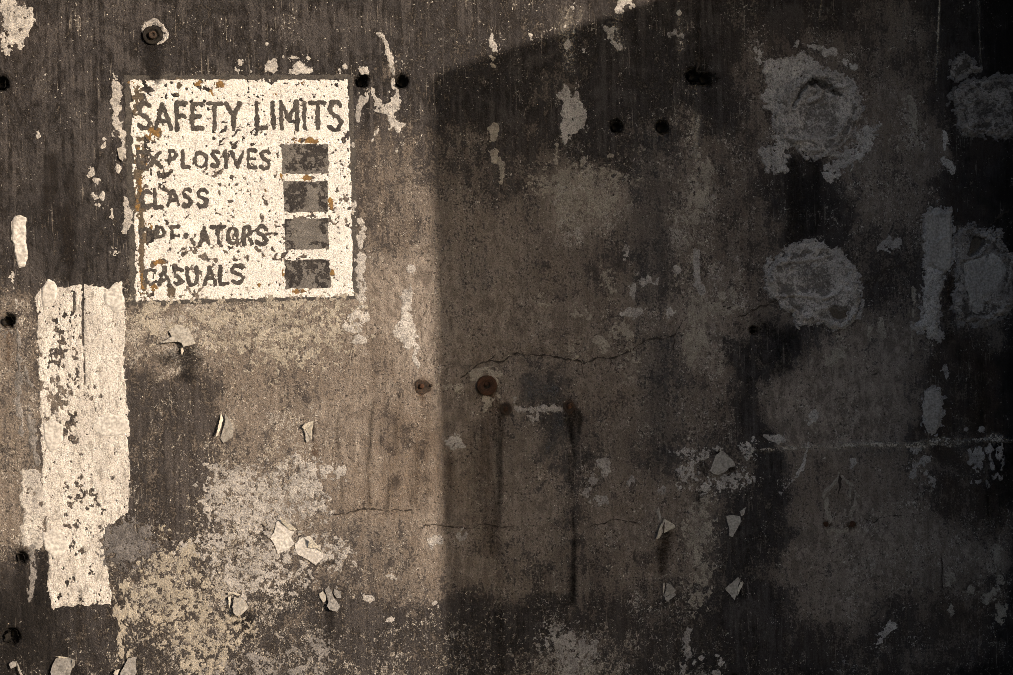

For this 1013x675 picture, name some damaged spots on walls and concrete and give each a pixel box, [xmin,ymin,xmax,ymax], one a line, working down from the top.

crack [460,320,683,379]
peeling [0,215,358,675]
peeling [580,458,613,507]
peeling [427,534,444,550]
peeling [663,544,726,675]
peeling [725,577,743,600]